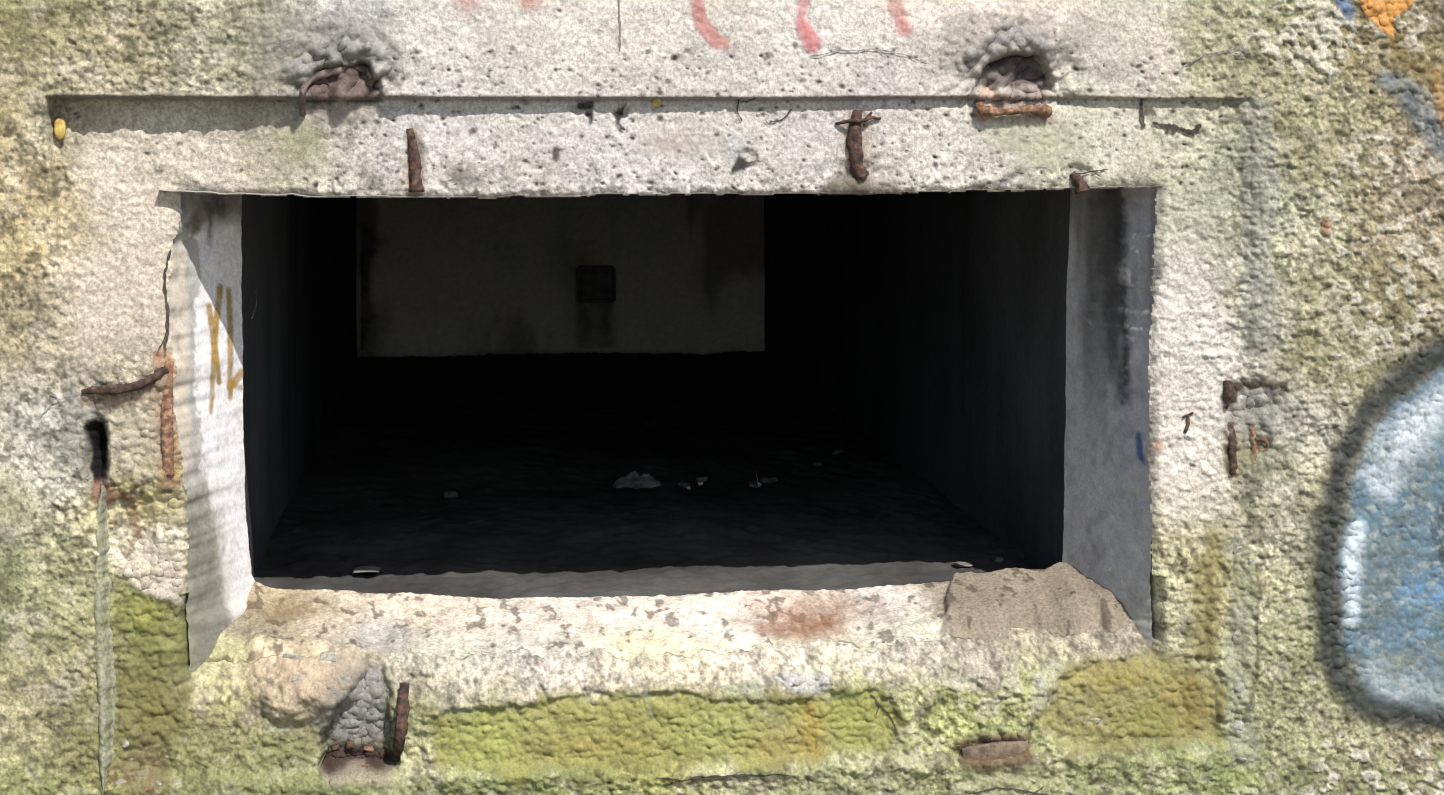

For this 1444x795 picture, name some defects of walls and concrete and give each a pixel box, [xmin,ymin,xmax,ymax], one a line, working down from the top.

spalling [283,31,395,117]
spalling [956,20,1063,107]
leakage [1102,199,1128,403]
spalling [74,381,161,505]
rust [1223,380,1270,475]
spalling [313,666,410,785]